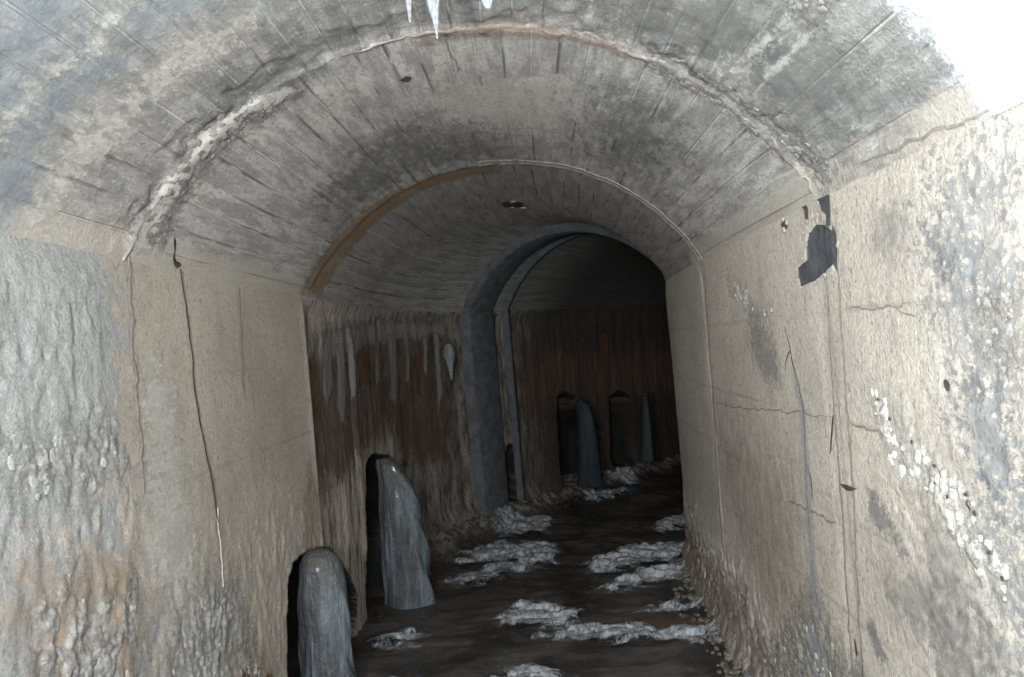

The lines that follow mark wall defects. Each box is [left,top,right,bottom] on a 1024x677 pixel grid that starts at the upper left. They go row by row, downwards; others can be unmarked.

water stain [29,13,260,238]
water stain [134,1,366,253]
peeling [644,0,840,286]
water stain [595,0,890,161]
crack [173,238,224,587]
corrosion [308,321,456,501]
crack [716,327,885,613]
crack [849,302,915,316]
water stain [867,487,905,555]
water stain [875,0,1024,677]
water stain [867,618,886,661]